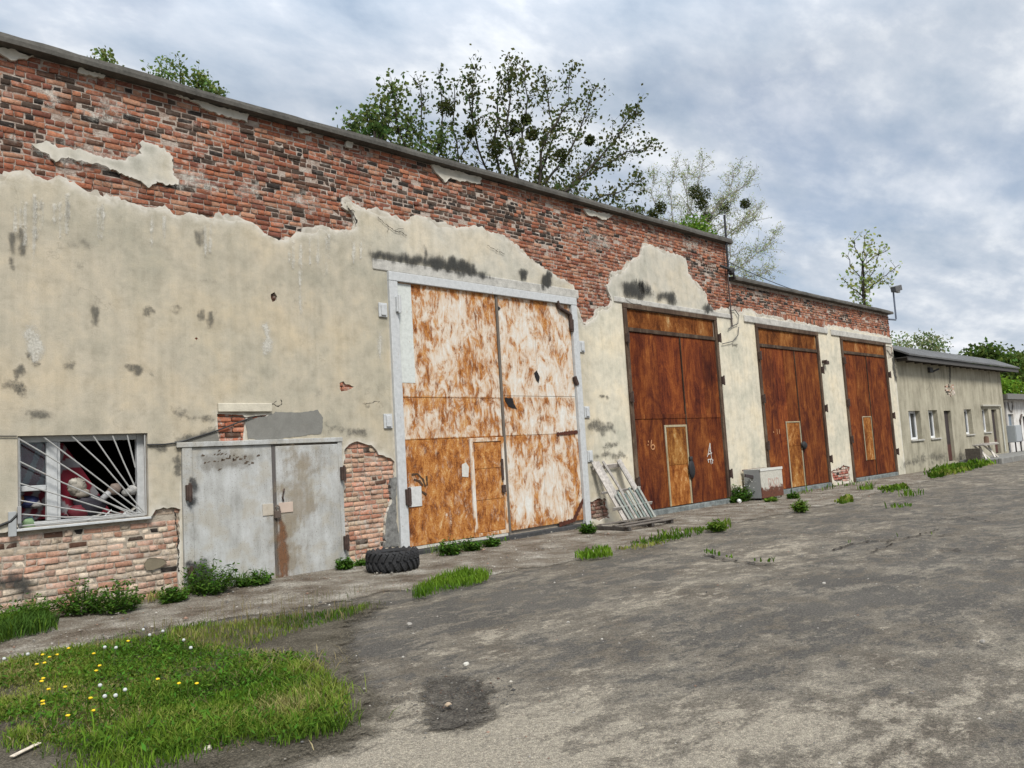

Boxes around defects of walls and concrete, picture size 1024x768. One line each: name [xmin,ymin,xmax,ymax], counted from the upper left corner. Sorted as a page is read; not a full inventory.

leakage [9,193,70,264]
flaking render [0,47,893,358]
leakage [352,246,490,279]
leakage [541,271,552,289]
leakage [624,279,677,304]
flaking render [201,414,266,471]
flaking render [344,442,393,561]
flaking render [831,465,850,482]
flaking render [0,508,179,613]
rust [277,519,289,578]